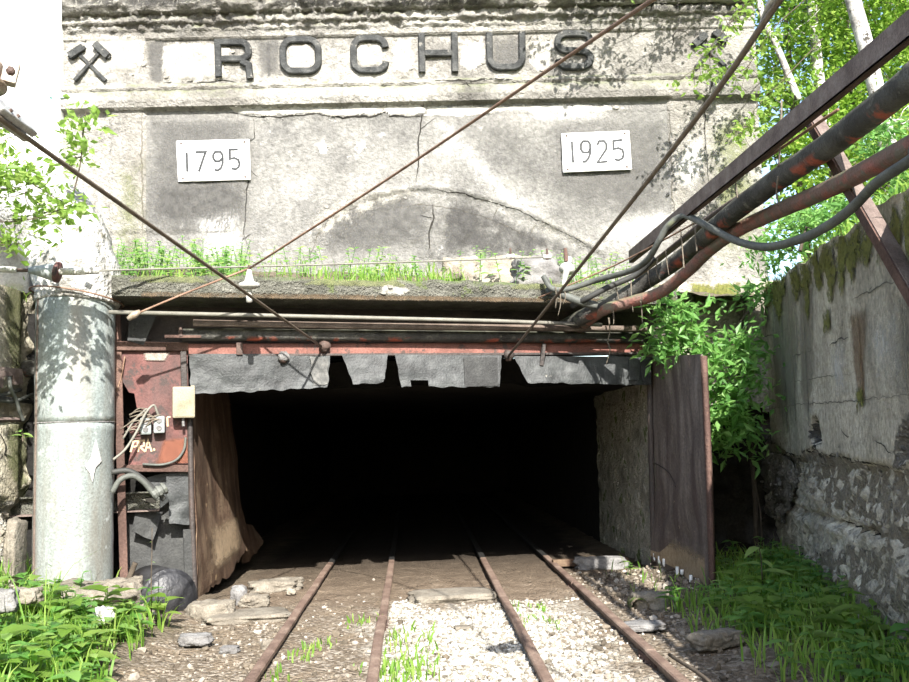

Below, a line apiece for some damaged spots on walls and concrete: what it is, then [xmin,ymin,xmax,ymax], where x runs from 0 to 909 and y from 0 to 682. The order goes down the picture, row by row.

crack [218,171,258,260]
crack [230,102,591,260]
leakage [773,283,813,431]
leakage [899,304,909,394]
rust [160,439,188,463]
spalling [712,413,909,644]